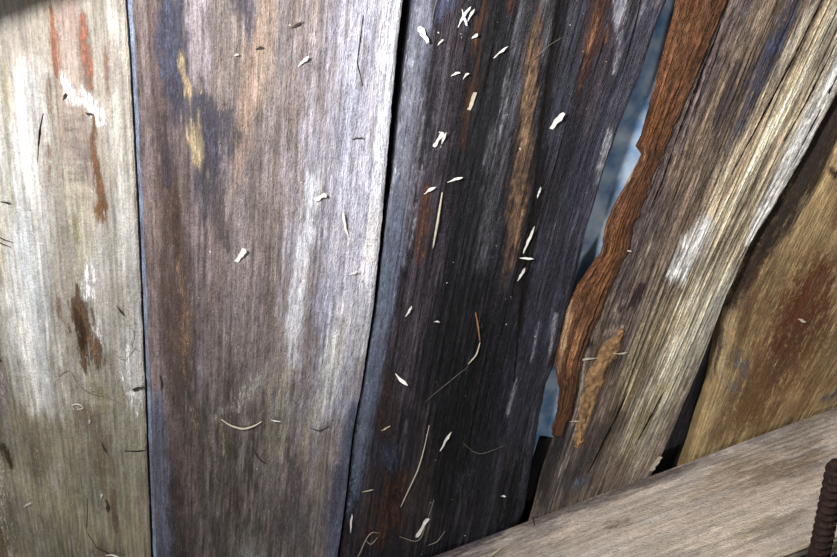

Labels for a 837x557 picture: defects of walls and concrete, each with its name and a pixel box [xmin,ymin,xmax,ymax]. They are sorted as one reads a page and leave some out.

rust [46,6,59,113]
rust [79,13,93,91]
rust [90,115,107,223]
crack [648,25,720,212]
crack [731,0,822,175]
rust [711,246,837,437]